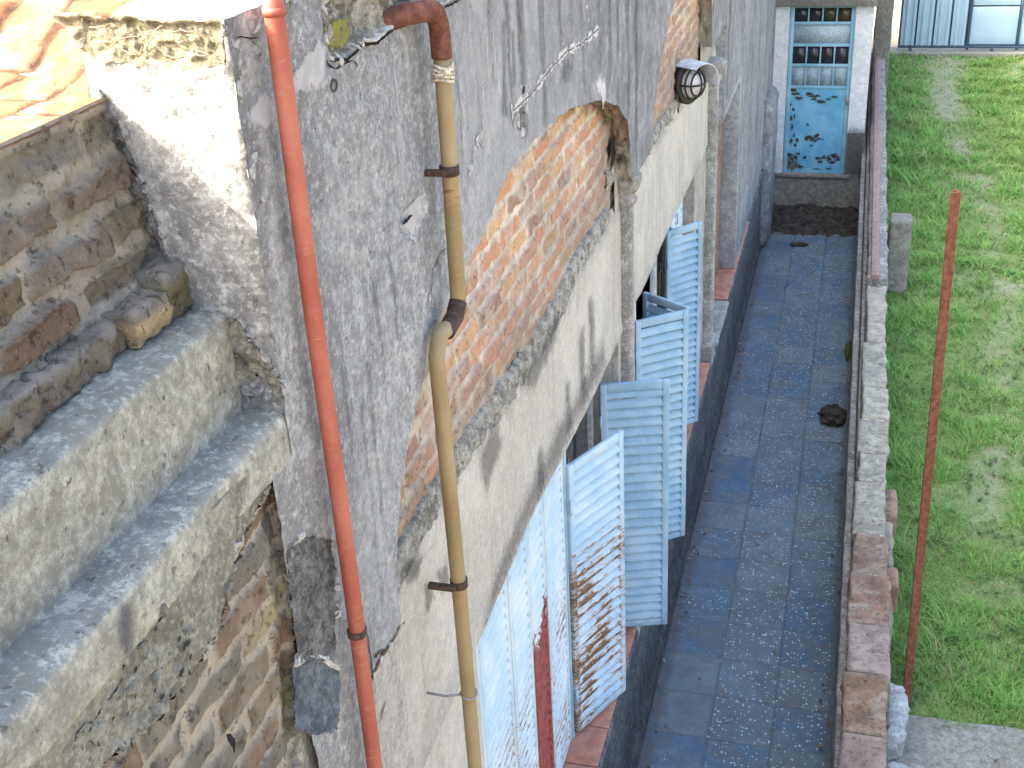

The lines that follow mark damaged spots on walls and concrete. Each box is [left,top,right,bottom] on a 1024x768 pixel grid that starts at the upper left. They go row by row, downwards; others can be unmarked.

spalling [50,12,242,71]
spalling [320,0,414,66]
crack [511,4,600,120]
spalling [516,87,529,138]
peeling [787,88,840,171]
spalling [247,152,258,180]
spalling [605,137,617,193]
spalling [399,193,429,243]
spalling [453,207,611,485]
spalling [397,467,443,593]
spalling [74,482,342,768]